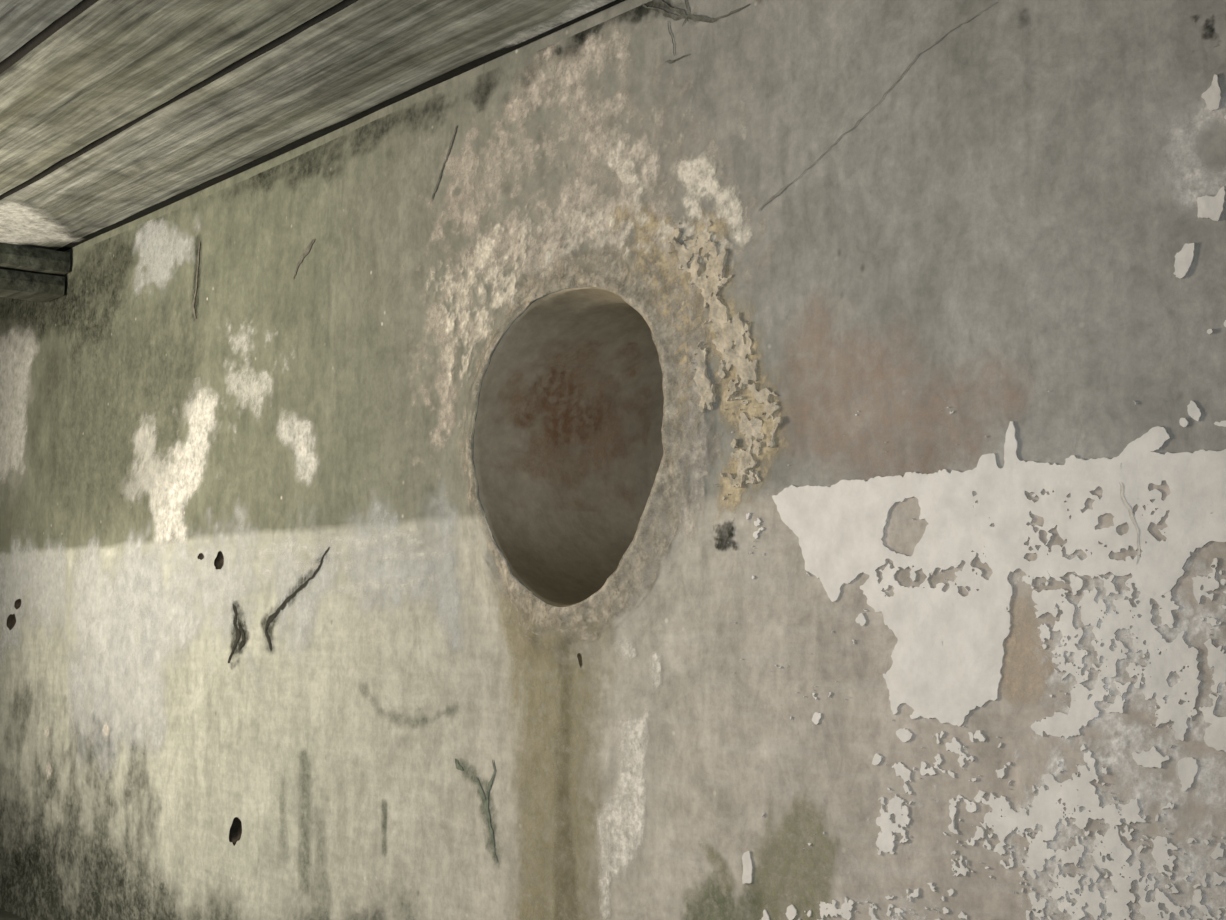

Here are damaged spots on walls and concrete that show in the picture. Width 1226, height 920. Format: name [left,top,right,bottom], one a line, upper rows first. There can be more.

damp [0,239,132,336]
damp [413,30,765,445]
peeling [1169,74,1226,221]
damp [675,333,709,537]
crack [228,547,329,663]
peeling [612,207,1226,920]
damp [0,800,179,920]
damp [502,598,649,920]